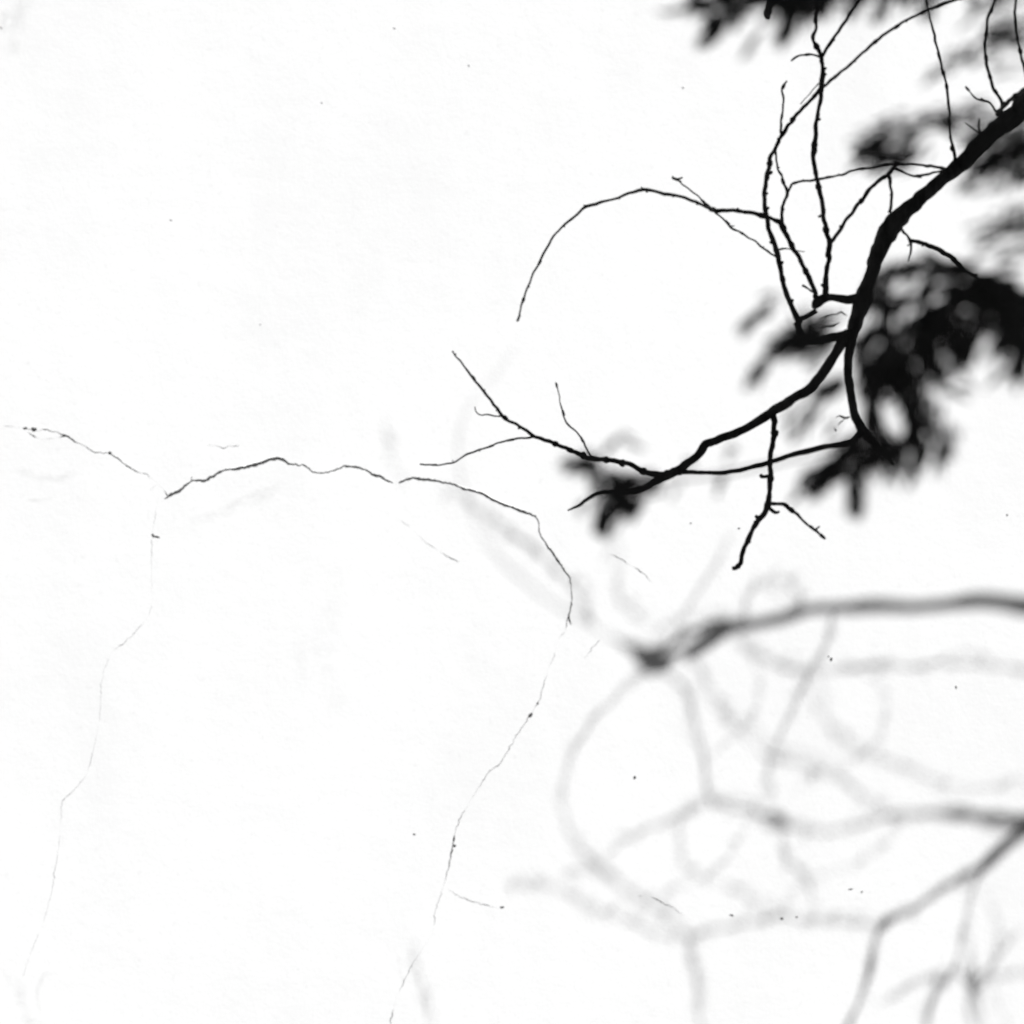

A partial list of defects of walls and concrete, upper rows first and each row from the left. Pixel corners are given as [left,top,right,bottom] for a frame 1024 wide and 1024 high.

crack [13,426,572,633]
crack [390,660,553,1022]